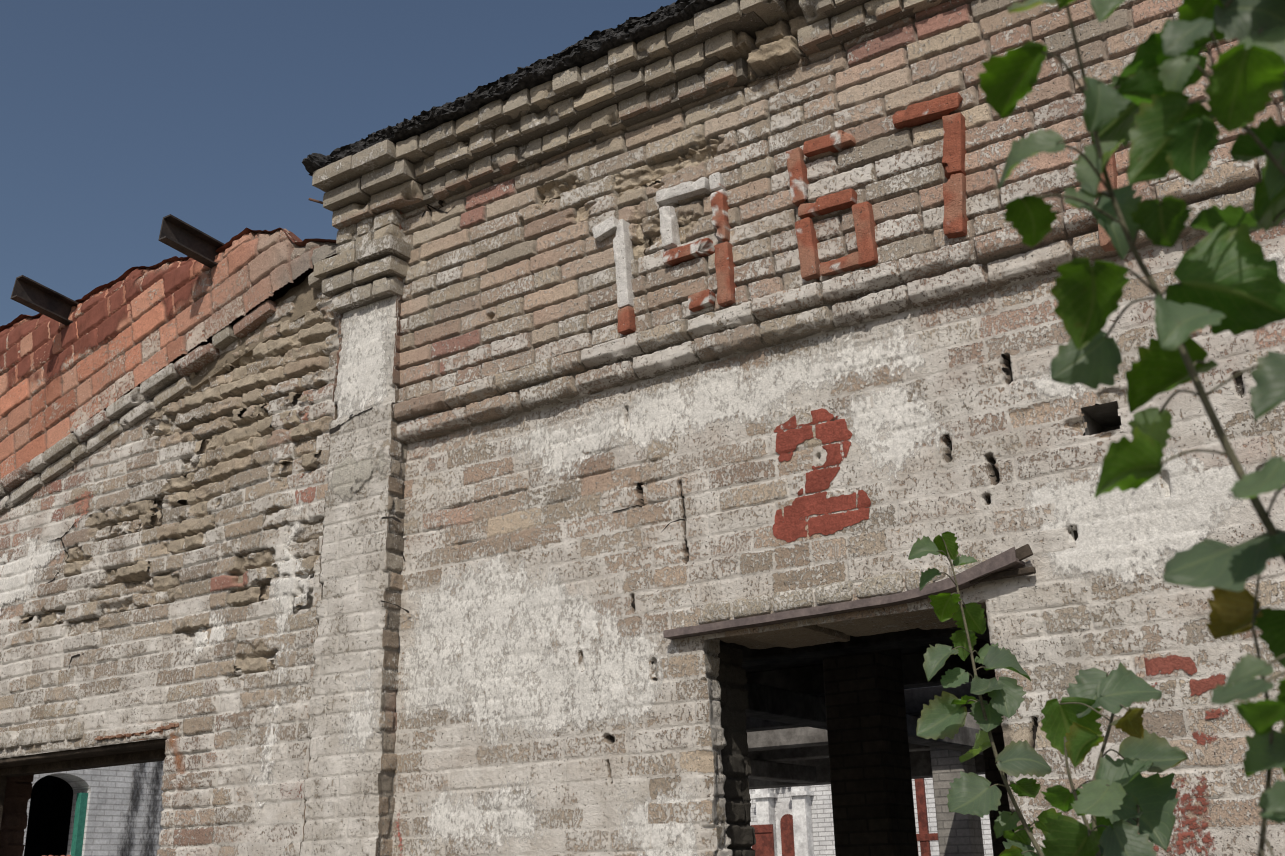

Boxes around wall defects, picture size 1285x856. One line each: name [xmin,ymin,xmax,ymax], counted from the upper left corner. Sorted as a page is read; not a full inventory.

spalling [78,297,393,554]
crack [613,483,644,512]
crack [663,491,689,558]
spalling [108,560,182,605]
peeling [193,498,320,807]
peeling [339,654,383,753]
peeling [1139,655,1226,696]
peeling [1192,708,1228,745]
peeling [1154,776,1215,856]